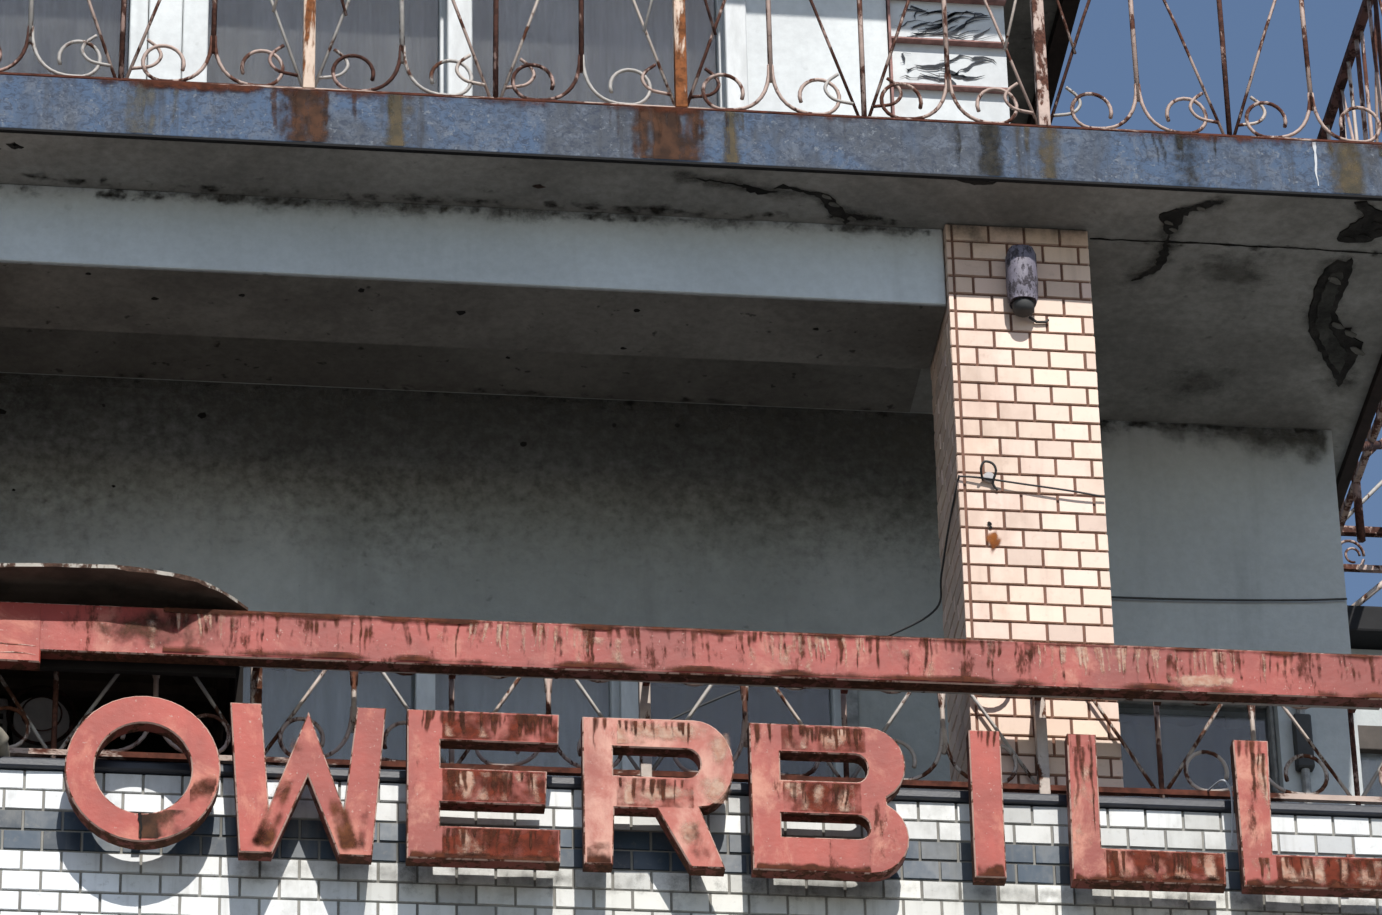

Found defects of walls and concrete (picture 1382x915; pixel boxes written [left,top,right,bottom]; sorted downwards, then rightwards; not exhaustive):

corrosion [96,78,384,142]
corrosion [615,105,705,161]
corrosion [1165,133,1292,142]
water stain [68,179,164,199]
water stain [191,186,557,216]
water stain [577,205,773,223]
crack [679,172,870,224]
crack [1090,198,1382,281]
flaking render [1307,201,1382,387]
water stain [1099,420,1326,459]
corrosion [987,532,1001,549]